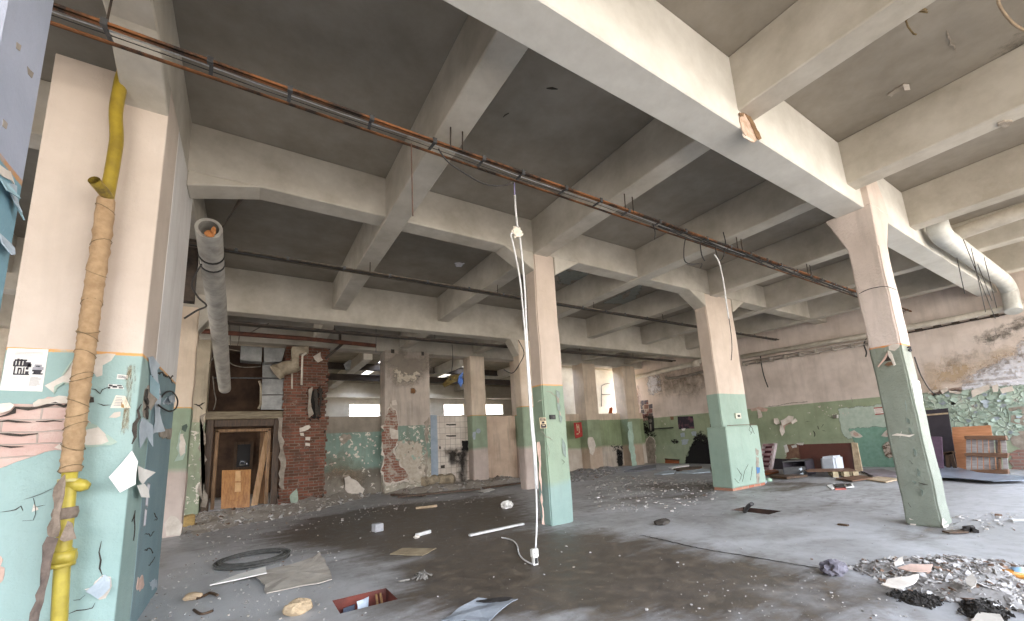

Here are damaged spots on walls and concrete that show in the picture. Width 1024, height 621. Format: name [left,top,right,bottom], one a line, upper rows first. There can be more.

spalling [738,112,762,143]
peeling [94,353,115,377]
damp [932,324,1024,398]
flaking render [0,358,74,468]
peeling [84,422,117,447]
flaking render [333,404,430,486]
peeling [751,407,797,436]
peeling [922,384,1024,470]